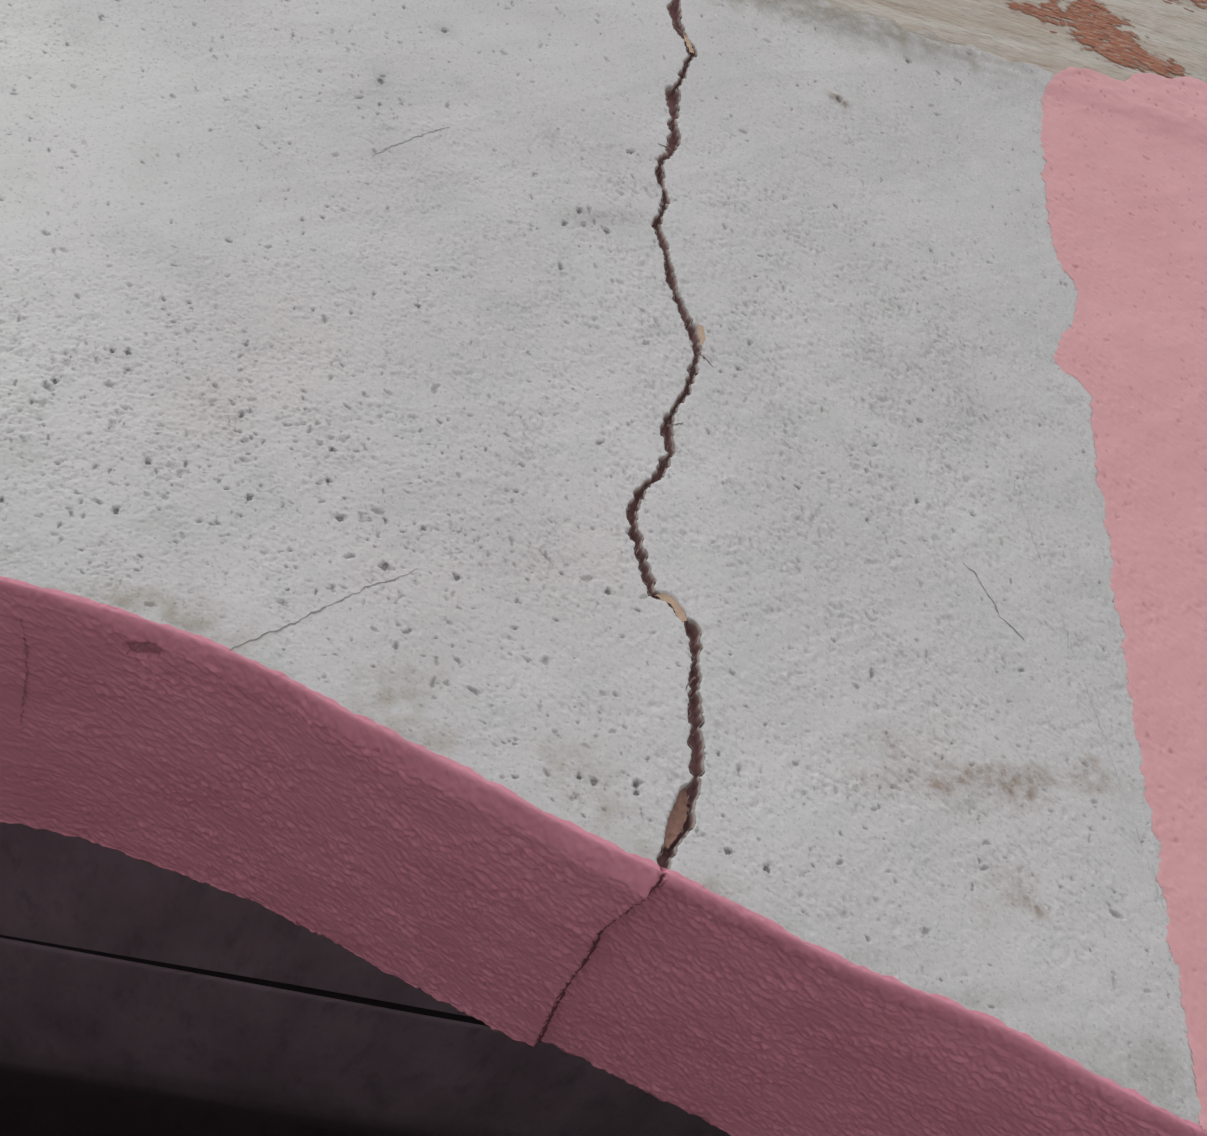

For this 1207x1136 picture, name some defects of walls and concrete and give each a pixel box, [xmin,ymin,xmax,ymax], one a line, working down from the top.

crack [533,0,713,1046]
peeling [1006,0,1189,79]